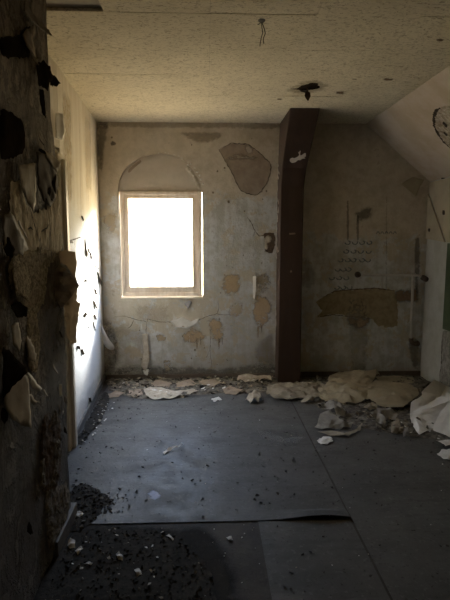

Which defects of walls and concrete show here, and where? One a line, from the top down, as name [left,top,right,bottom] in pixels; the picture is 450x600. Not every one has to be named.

spalling [0,0,61,118]
spalling [296,83,320,101]
spalling [0,109,25,160]
spalling [432,106,450,148]
spalling [217,143,279,222]
spalling [264,233,279,259]
spalling [1,140,114,428]
spalling [316,288,418,328]